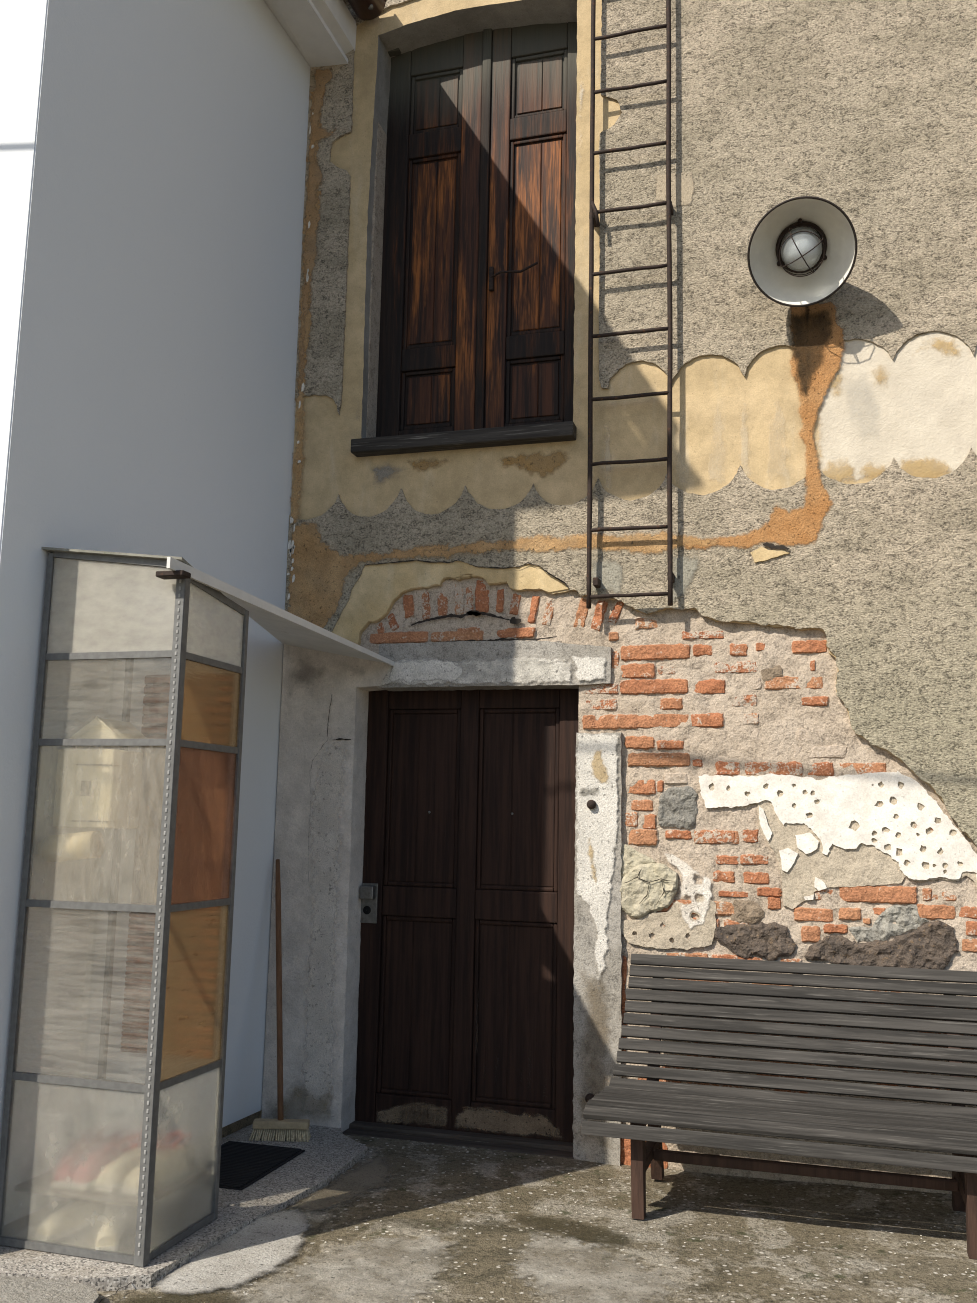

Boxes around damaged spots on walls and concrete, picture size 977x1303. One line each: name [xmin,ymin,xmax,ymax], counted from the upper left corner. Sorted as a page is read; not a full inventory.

rust [287,69,845,628]
crack [411,610,557,642]
flaking render [332,561,977,1108]
flaking render [621,1122,631,1166]
flaking render [646,1124,952,1194]